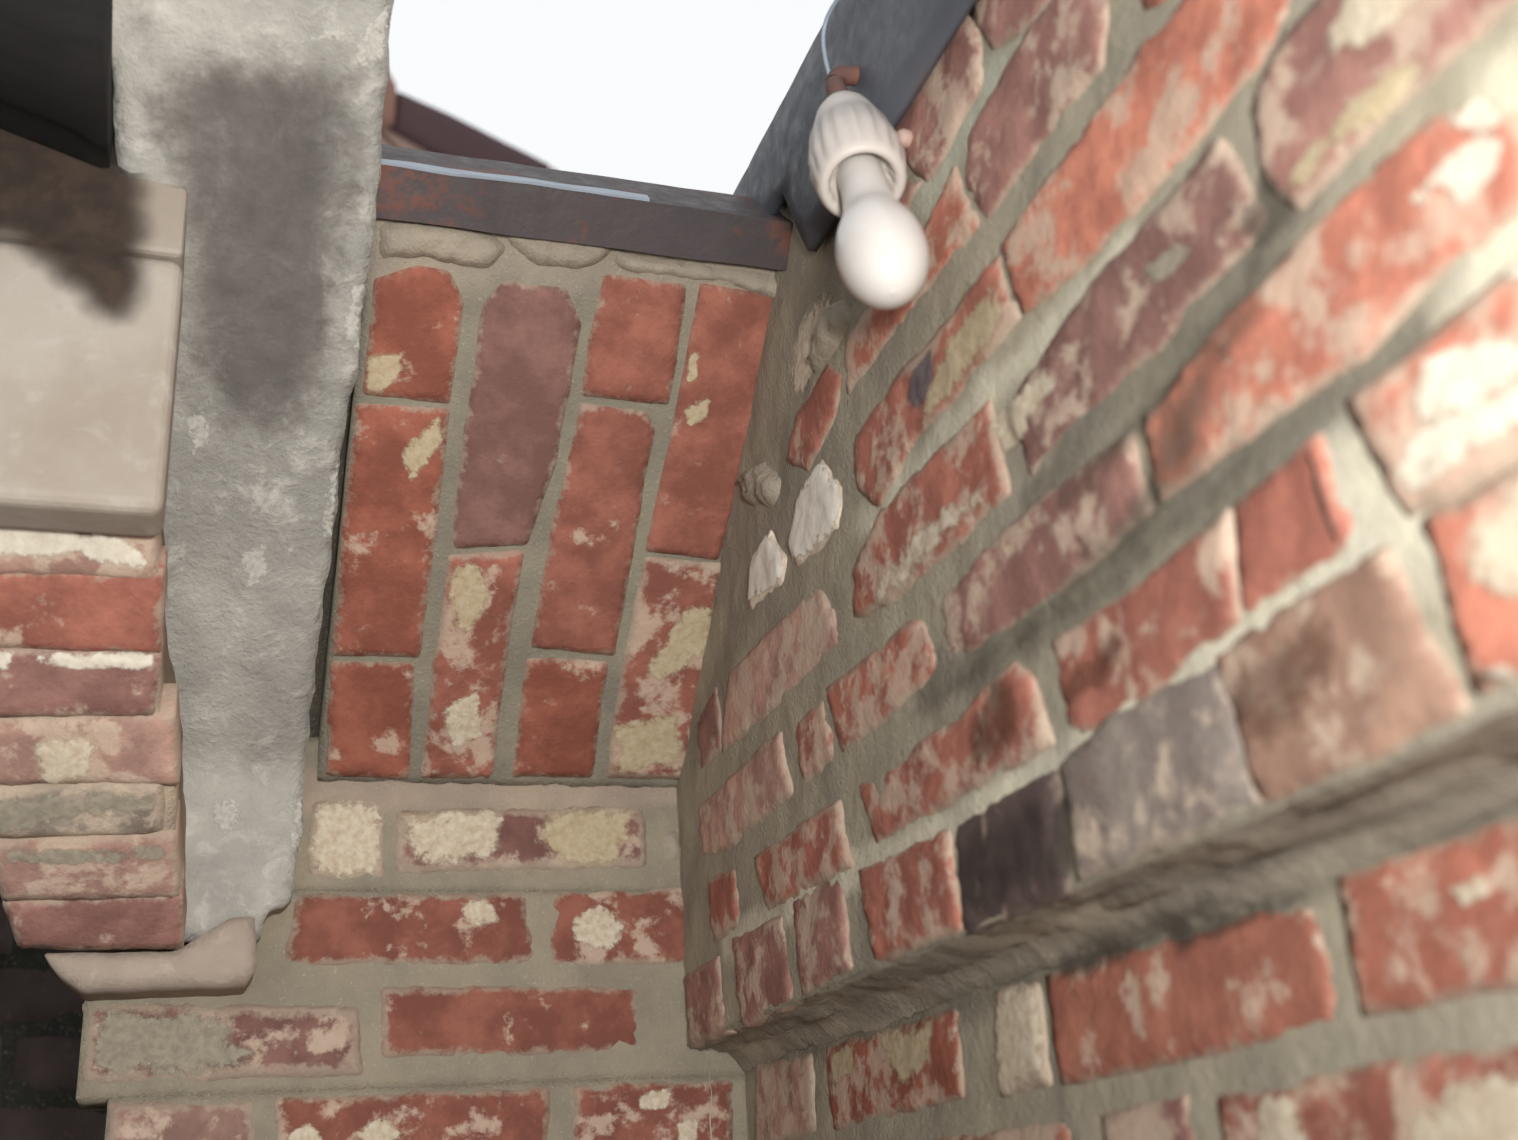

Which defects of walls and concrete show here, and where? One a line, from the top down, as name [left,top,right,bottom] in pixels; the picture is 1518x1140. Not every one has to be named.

damp [0,128,142,314]
damp [176,70,330,404]